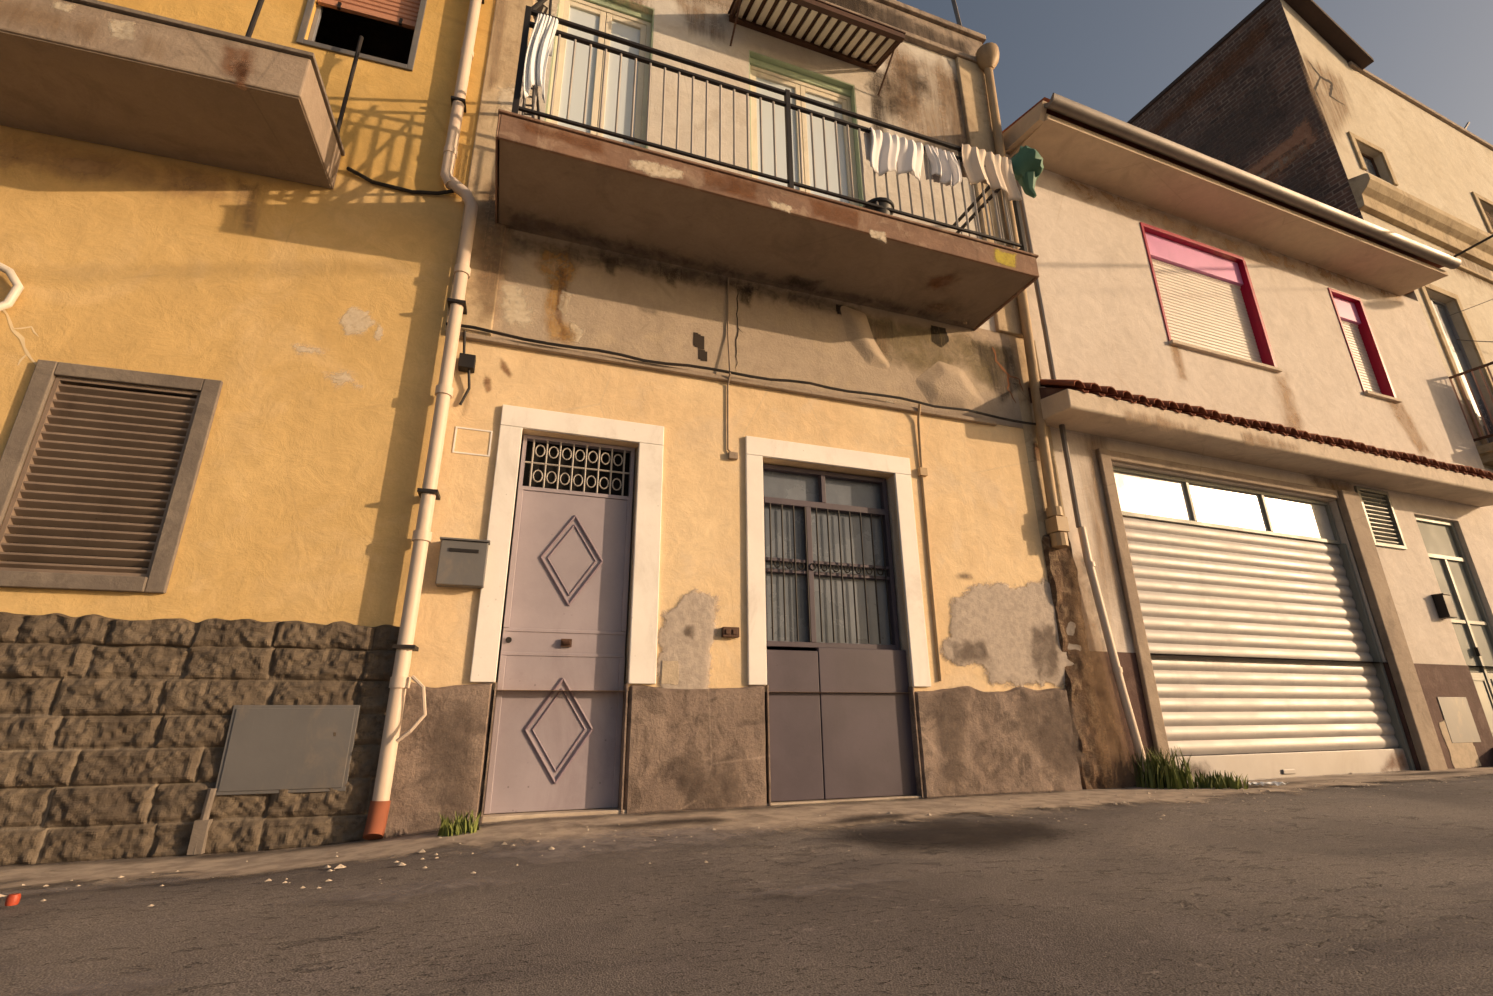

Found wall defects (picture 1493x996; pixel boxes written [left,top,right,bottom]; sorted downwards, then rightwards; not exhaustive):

flaking render [530,0,559,38]
leakage [827,0,967,54]
flaking render [498,86,539,112]
leakage [871,50,968,150]
crack [1308,61,1343,108]
leakage [172,174,212,192]
leakage [478,191,1016,399]
peeling [340,308,383,339]